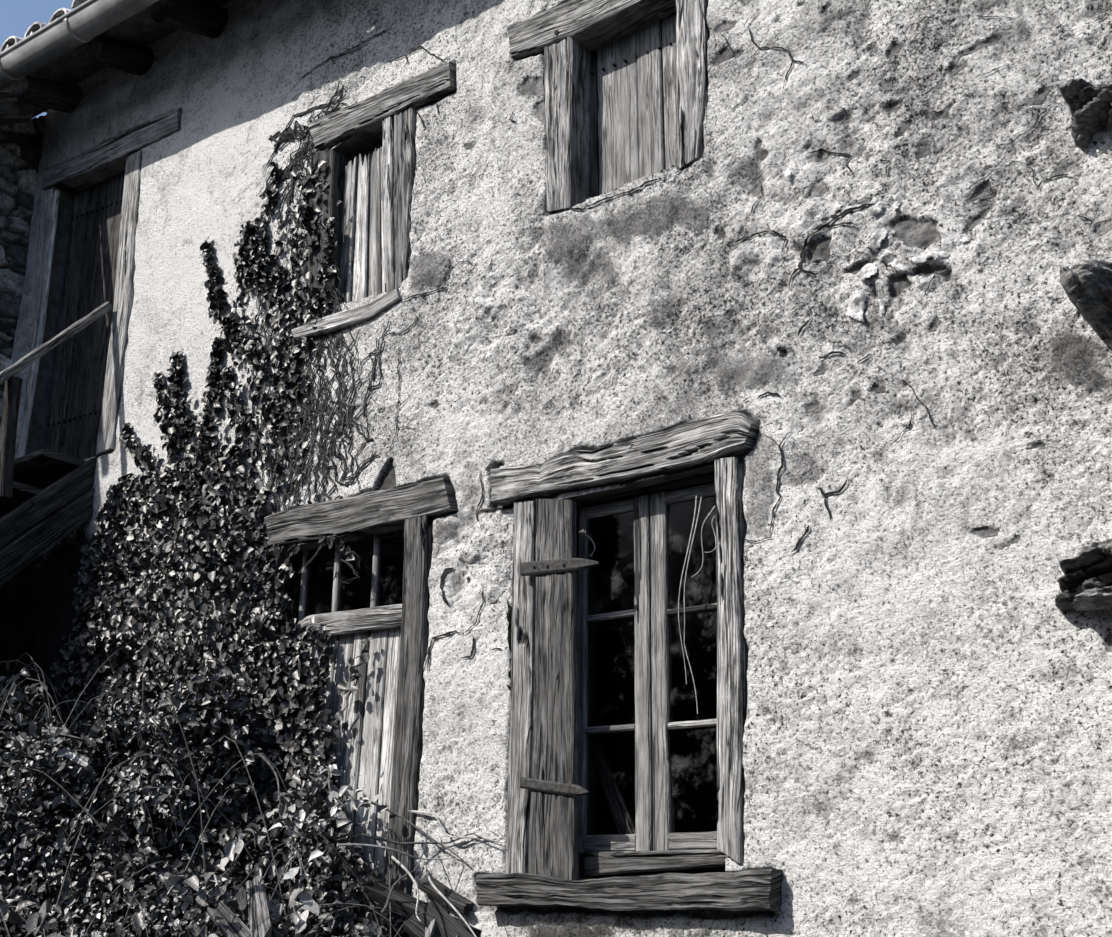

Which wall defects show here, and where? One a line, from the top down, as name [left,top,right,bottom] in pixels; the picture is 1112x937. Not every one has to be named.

crack [704,5,804,111]
peeling [754,137,768,160]
peeling [811,181,828,197]
peeling [959,182,996,242]
peeling [780,235,831,266]
peeling [846,196,951,322]
crack [743,392,781,401]
crack [744,430,848,553]